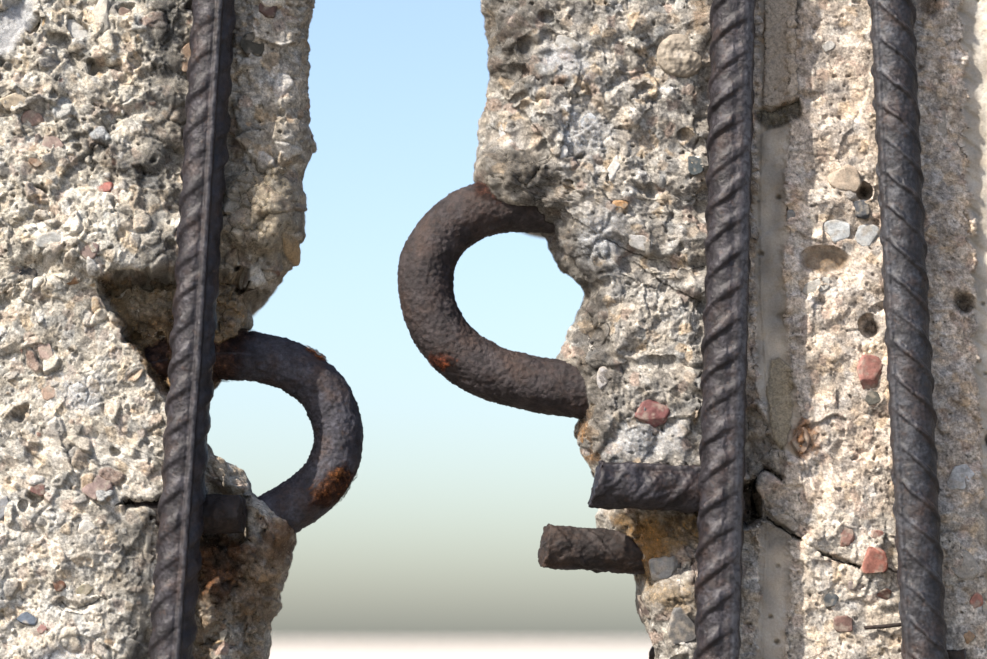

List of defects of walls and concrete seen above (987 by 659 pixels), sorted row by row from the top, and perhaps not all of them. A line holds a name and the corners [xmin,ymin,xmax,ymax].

corrosion [105,289,174,389]
spalling [101,0,249,659]
corrosion [212,328,251,383]
corrosion [428,354,452,372]
spalling [588,0,801,659]
corrosion [199,523,291,614]
corrosion [309,468,358,508]
spalling [538,524,645,575]
crack [751,469,860,566]